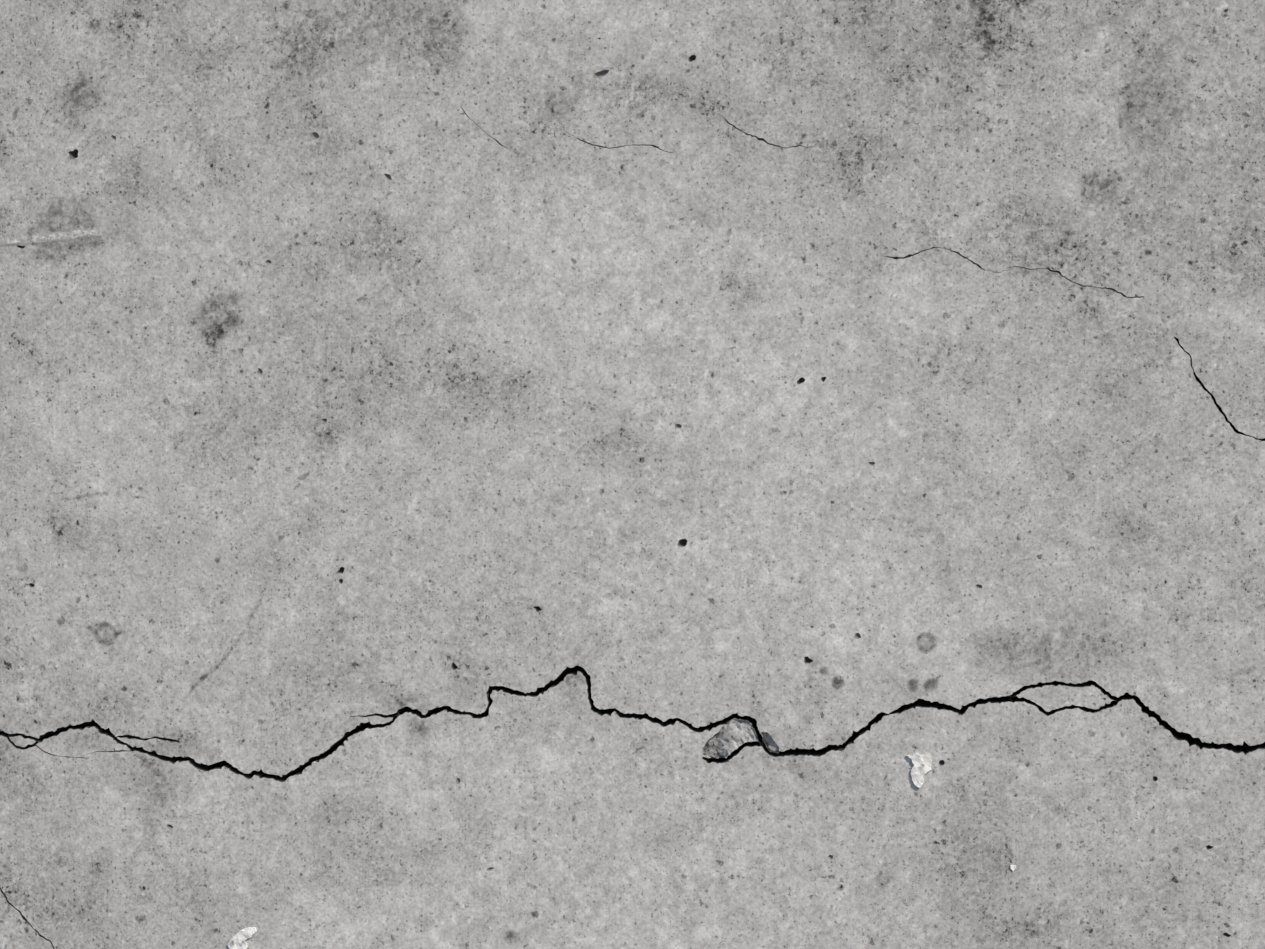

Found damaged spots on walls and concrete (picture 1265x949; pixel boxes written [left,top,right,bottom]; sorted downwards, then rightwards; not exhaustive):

crack [1174,337,1265,441]
crack [0,665,1265,782]
crack [0,887,54,949]
peeling [228,927,257,949]